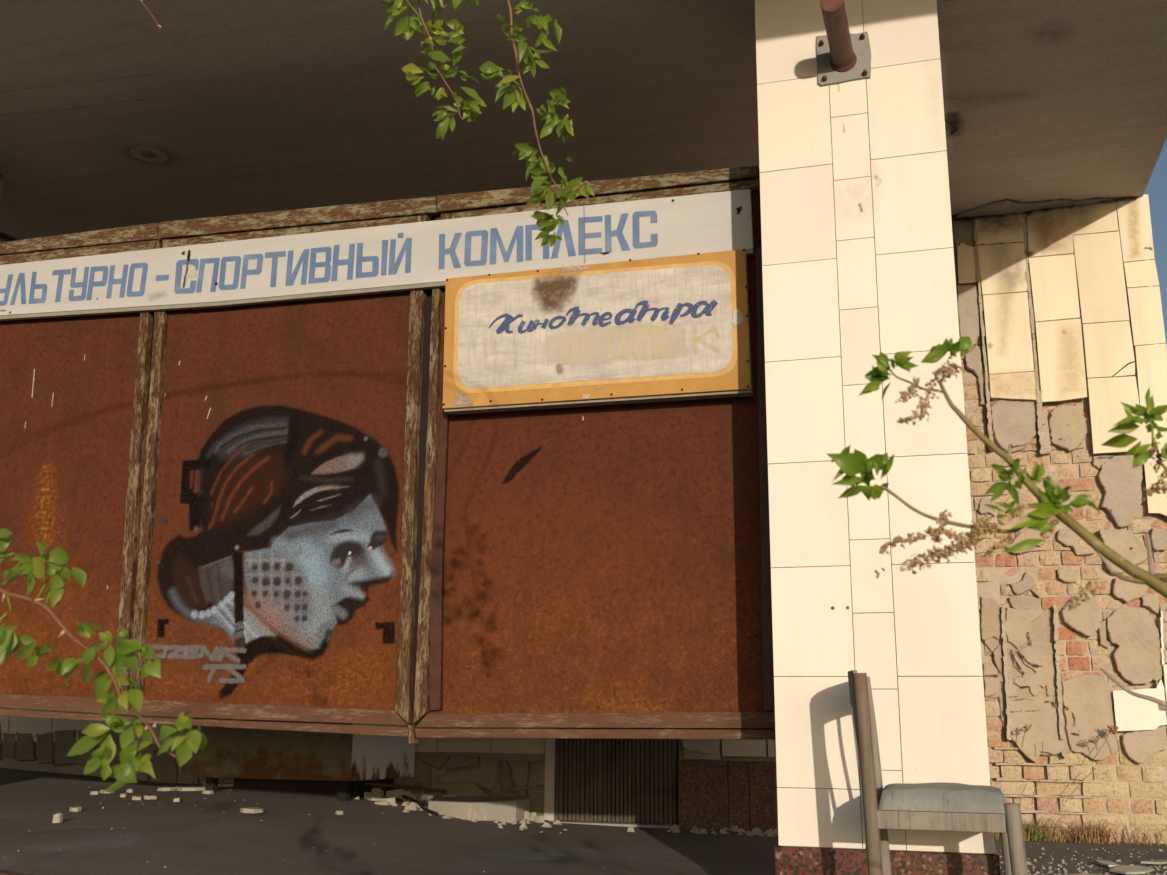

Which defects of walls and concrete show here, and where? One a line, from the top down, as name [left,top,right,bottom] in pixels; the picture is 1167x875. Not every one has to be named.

rust [0,291,410,710]
rust [428,193,769,714]
spalling [1135,343,1167,517]
spalling [1011,632,1040,688]
spalling [1113,664,1167,731]